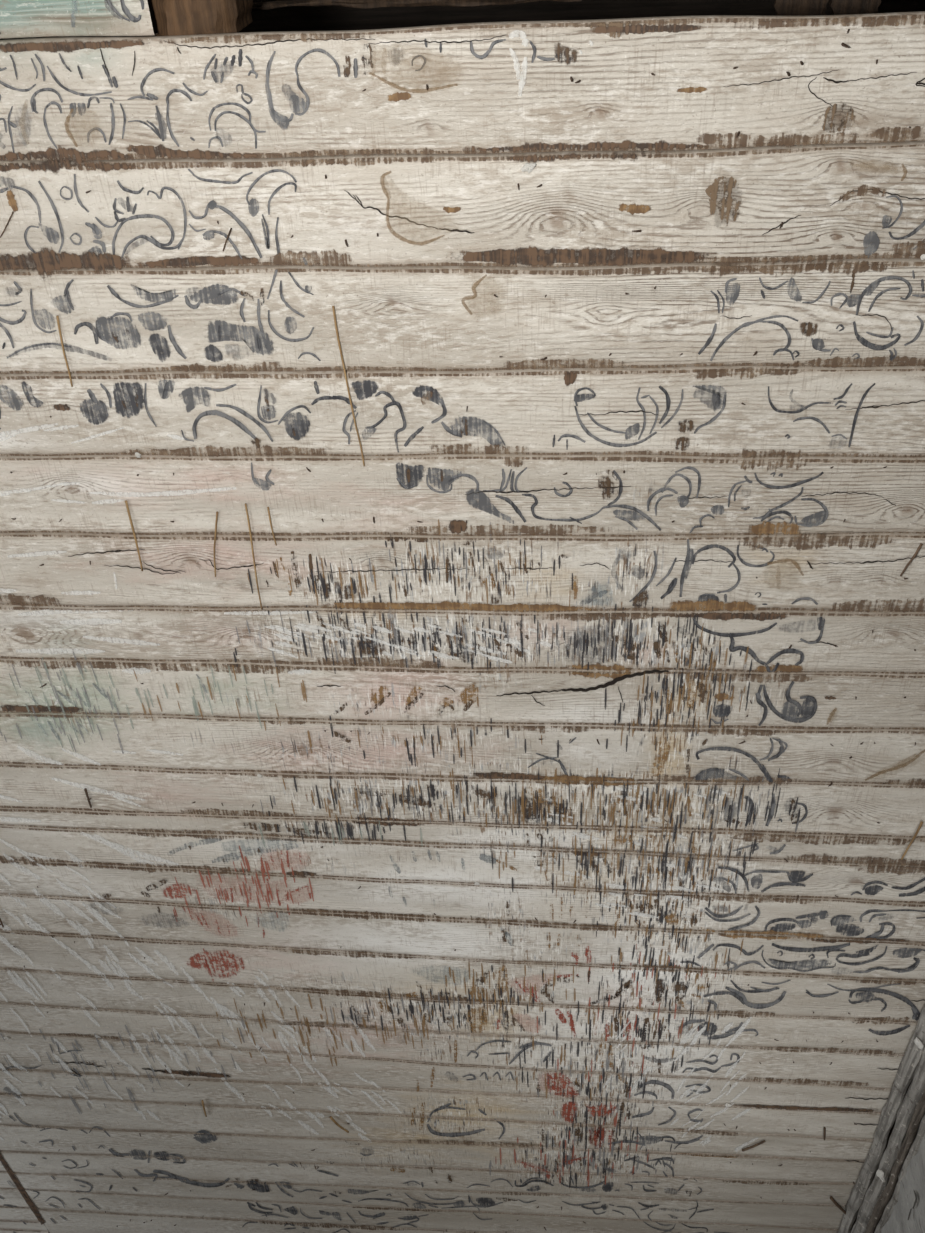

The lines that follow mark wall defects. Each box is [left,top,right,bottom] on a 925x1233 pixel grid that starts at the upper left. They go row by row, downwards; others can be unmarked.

crack [344,190,474,234]
crack [496,669,669,706]